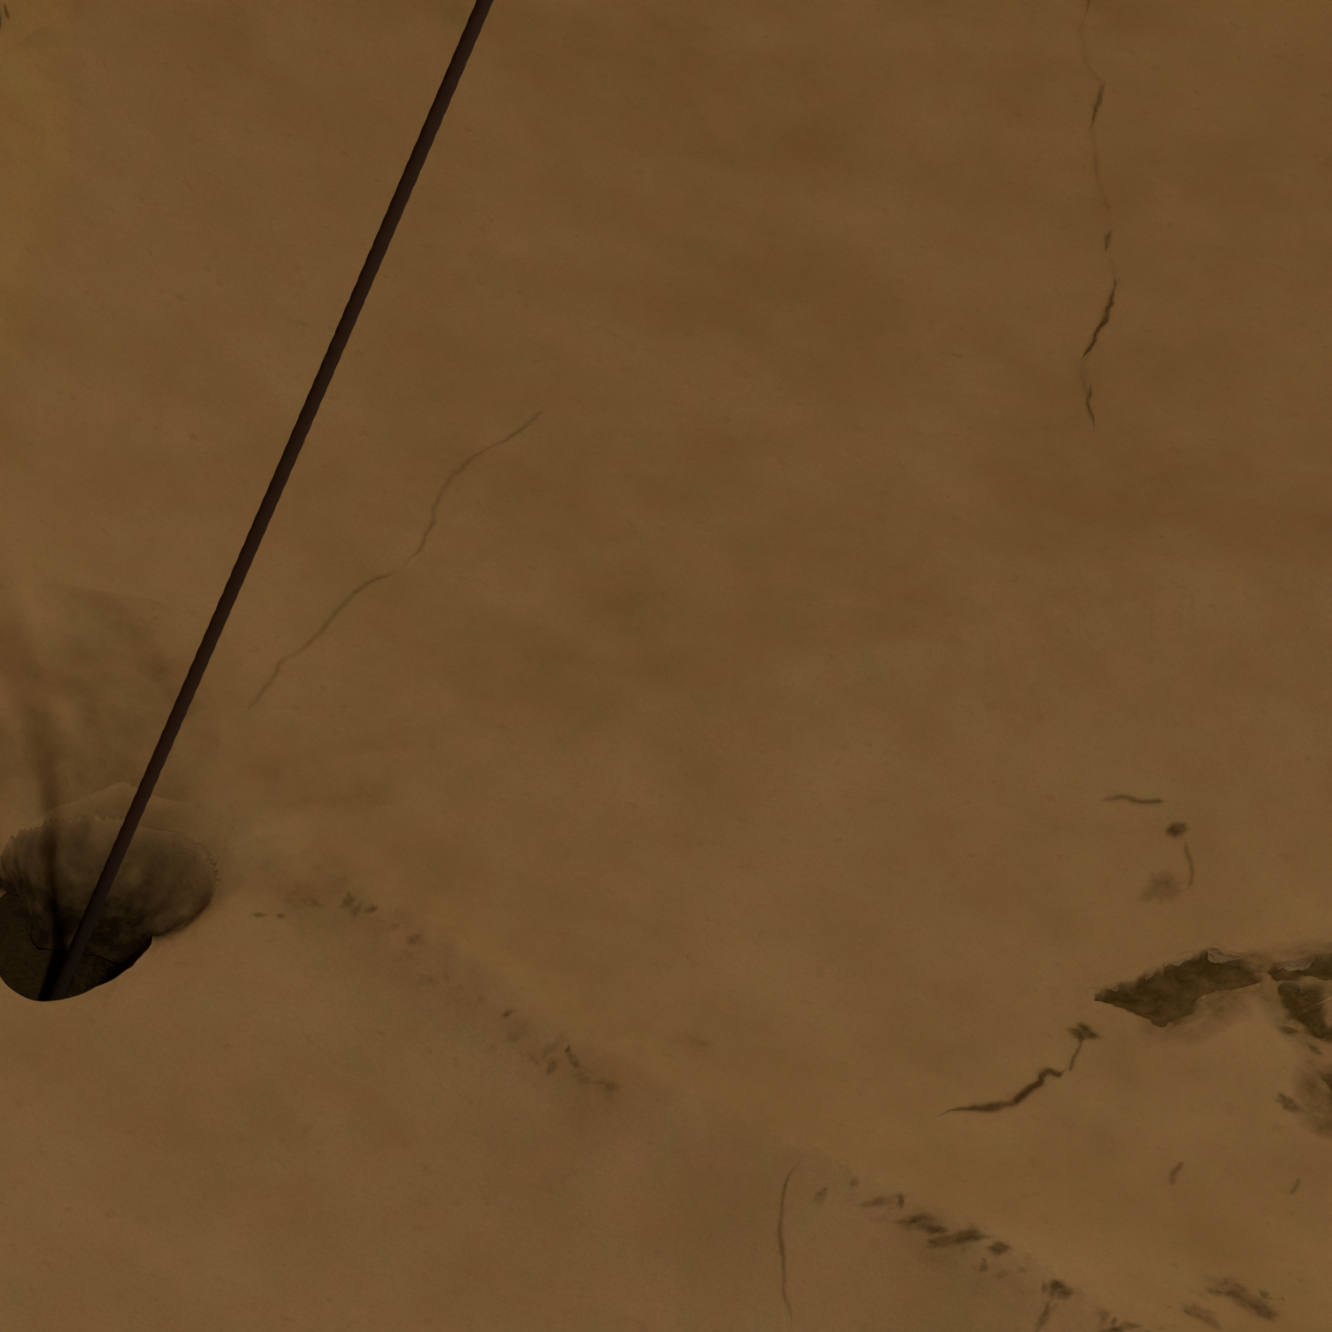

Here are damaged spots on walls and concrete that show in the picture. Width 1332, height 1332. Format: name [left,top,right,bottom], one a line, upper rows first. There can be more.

crack [1085,293,1114,354]
spalling [0,816,220,995]
crack [1073,1025,1096,1038]
spalling [1075,934,1332,1126]
crack [958,1069,1061,1110]